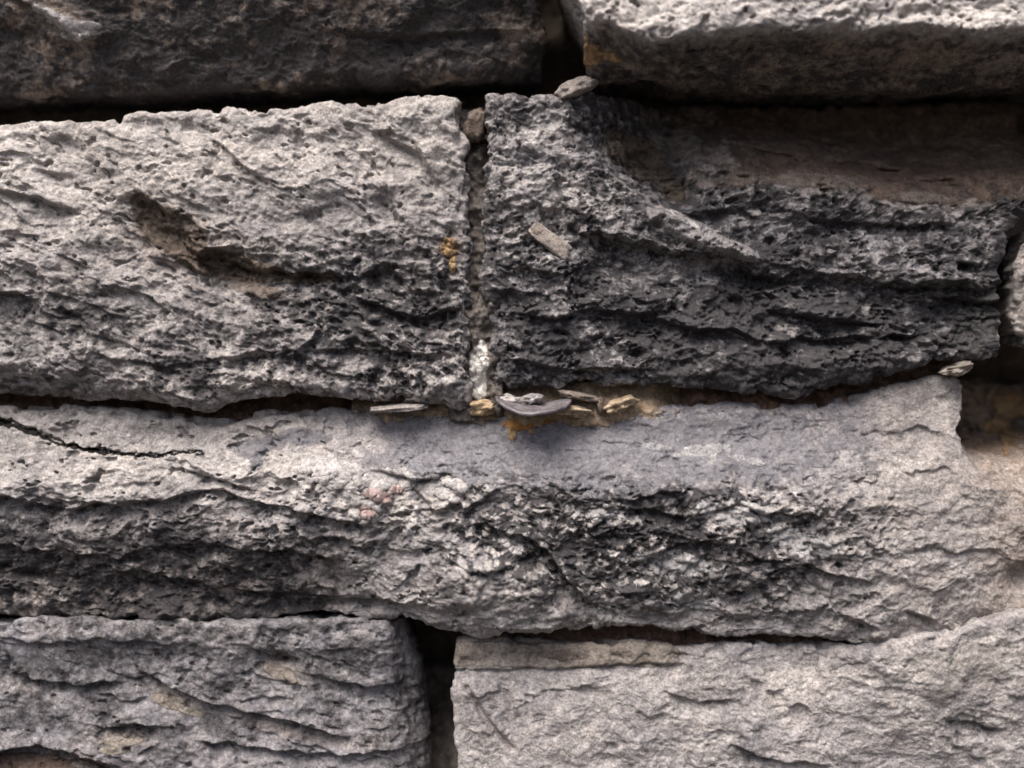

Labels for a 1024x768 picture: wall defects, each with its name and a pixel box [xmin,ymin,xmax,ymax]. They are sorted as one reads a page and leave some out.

crack [0,419,203,458]